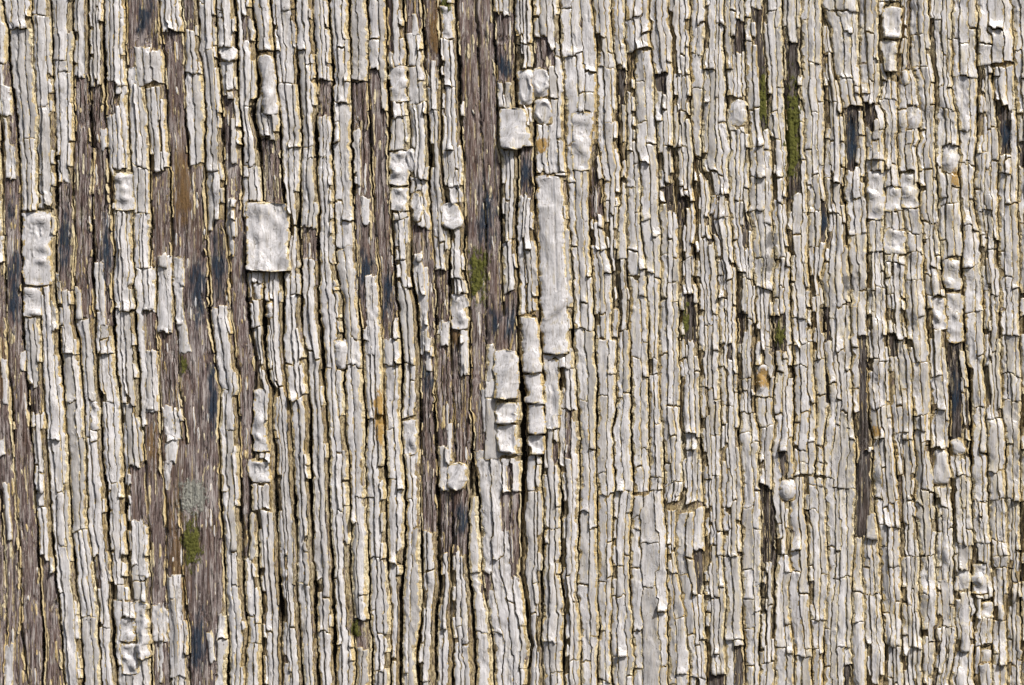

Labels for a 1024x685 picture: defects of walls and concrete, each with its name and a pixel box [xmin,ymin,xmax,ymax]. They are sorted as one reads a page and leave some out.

crack [0,0,191,685]
crack [181,0,241,454]
peeling [0,0,816,685]
crack [213,0,1024,685]
peeling [795,0,1024,685]